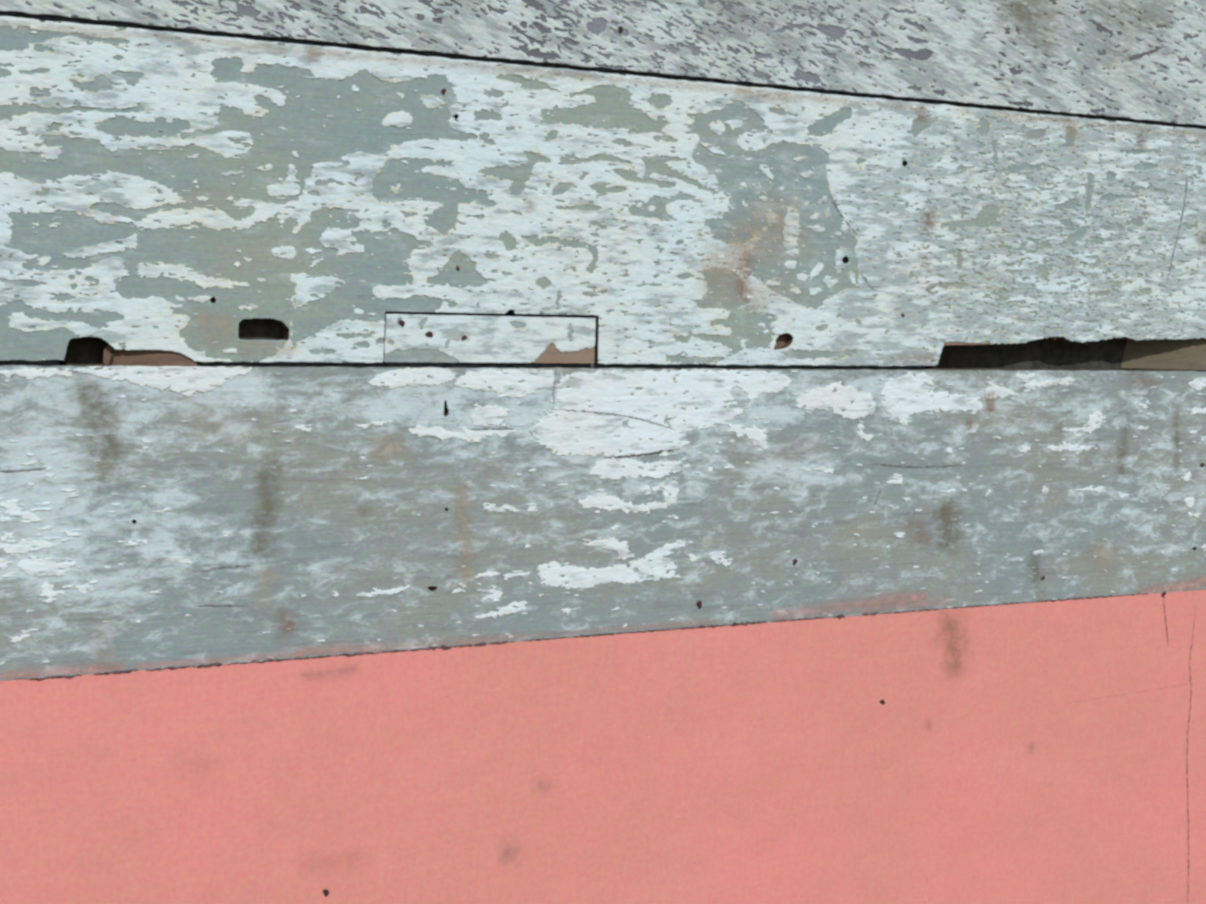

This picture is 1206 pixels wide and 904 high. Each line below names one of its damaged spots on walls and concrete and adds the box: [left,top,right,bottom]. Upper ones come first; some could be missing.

peeling [0,0,1206,623]
peeling [8,629,39,643]
crack [28,593,1196,902]